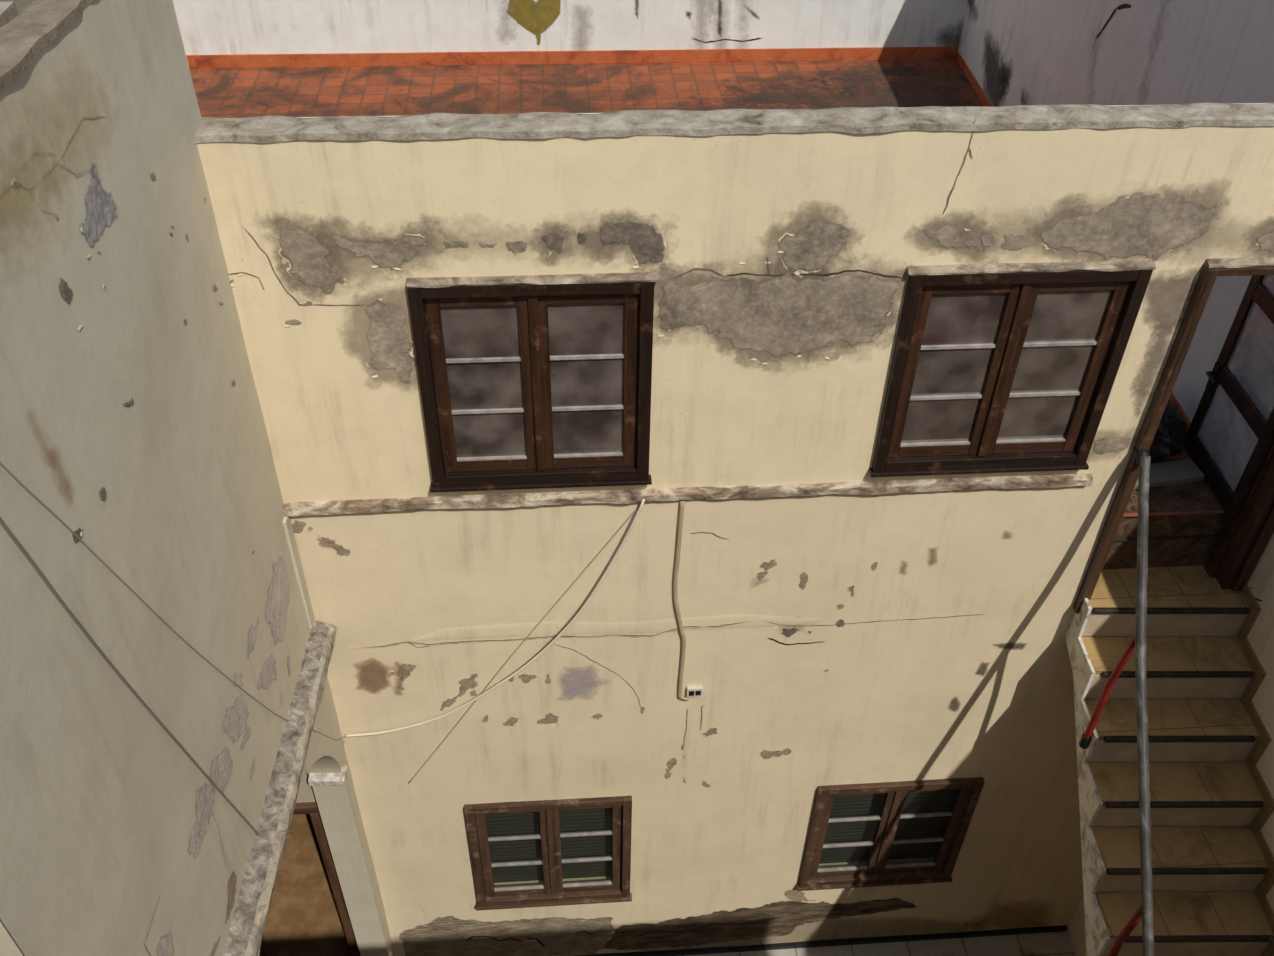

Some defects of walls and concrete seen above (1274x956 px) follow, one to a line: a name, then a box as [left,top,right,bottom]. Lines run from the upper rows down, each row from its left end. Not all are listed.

crack [0,116,104,220]
crack [942,116,977,216]
spalling [80,163,118,260]
spalling [279,227,426,294]
spalling [444,239,526,255]
spalling [543,221,666,269]
spalling [658,220,899,364]
spalling [922,190,1222,261]
spalling [365,299,416,384]
peeling [185,556,291,858]
peeling [387,664,416,690]